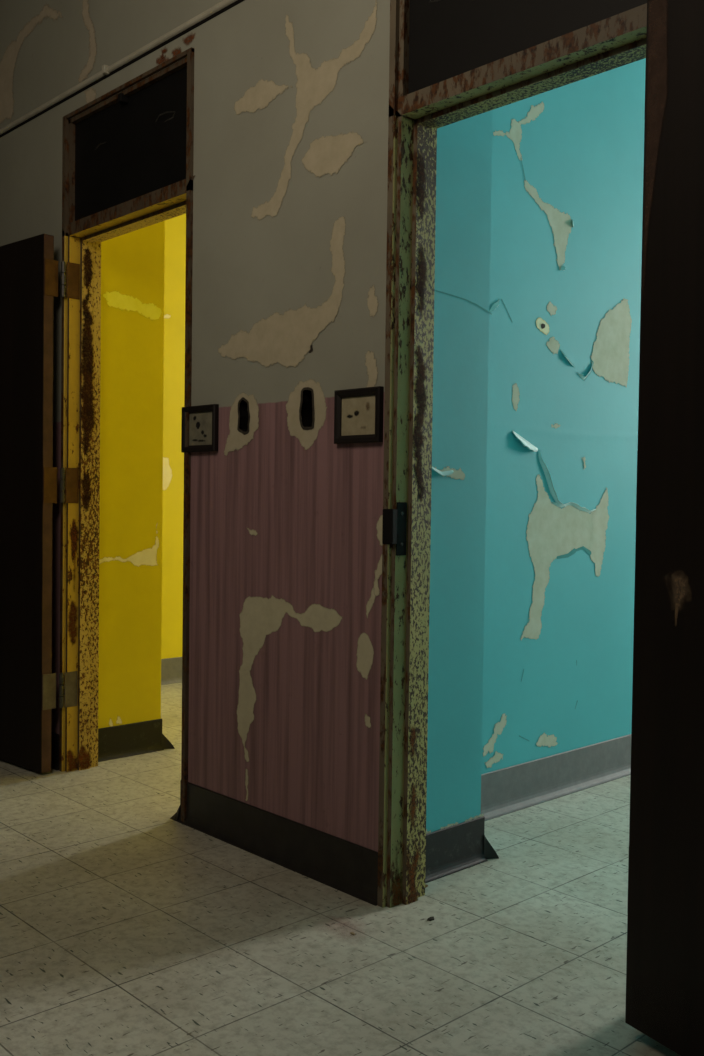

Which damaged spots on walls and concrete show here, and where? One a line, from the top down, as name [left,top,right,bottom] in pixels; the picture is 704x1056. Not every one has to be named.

peeling [493,102,574,271]
rust [80,249,96,511]
spalling [224,392,259,456]
spalling [286,379,327,450]
rust [413,339,428,501]
rust [416,245,428,316]
crack [434,290,512,321]
peeling [536,298,632,386]
peeling [512,430,609,640]
peeling [237,595,342,801]
rust [66,746,91,771]
rust [391,847,420,907]